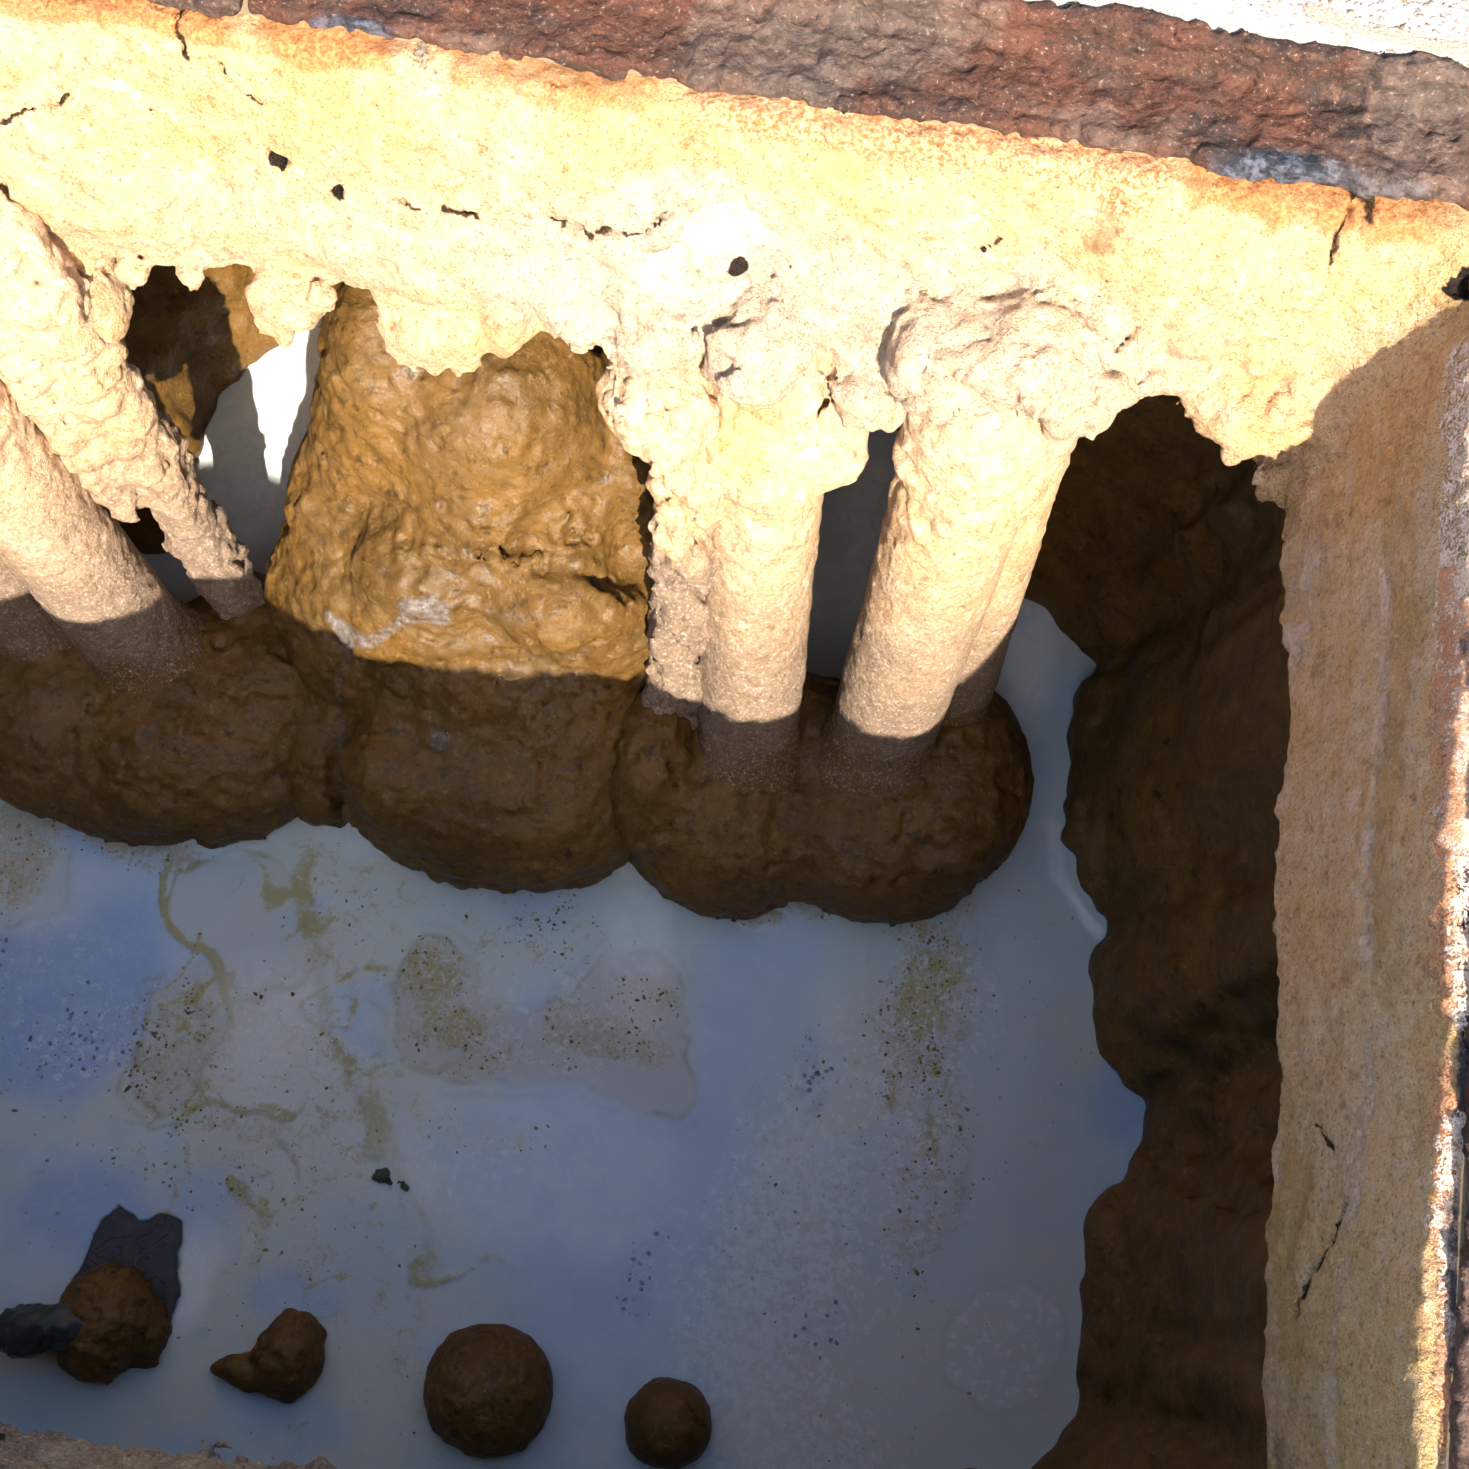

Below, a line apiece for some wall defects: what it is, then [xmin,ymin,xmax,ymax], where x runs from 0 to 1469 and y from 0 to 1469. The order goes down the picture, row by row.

crack [0,92,71,126]
corrosion [693,92,1451,245]
crack [1329,192,1375,266]
crack [1314,1124,1334,1151]
crack [1296,1202,1348,1319]